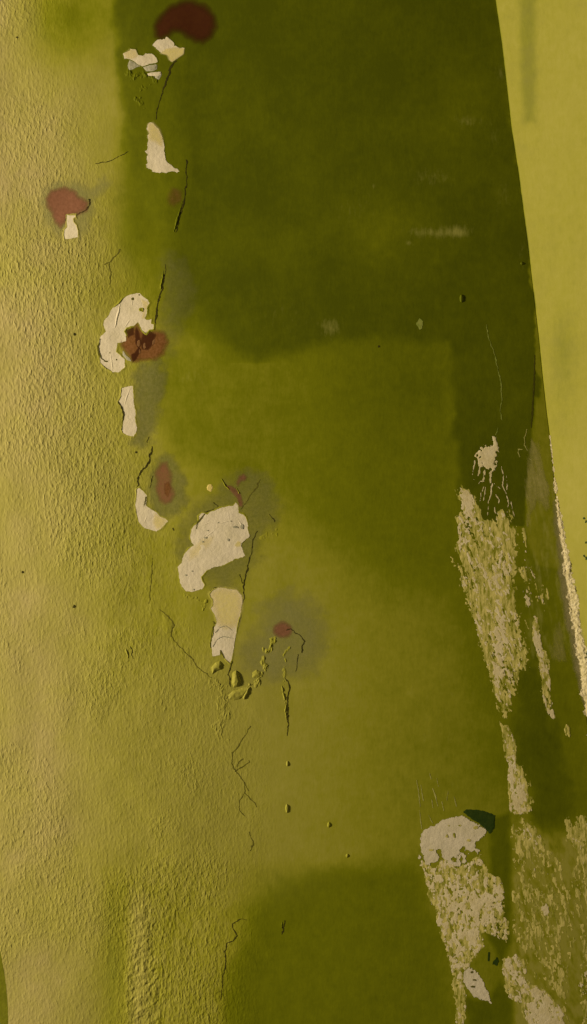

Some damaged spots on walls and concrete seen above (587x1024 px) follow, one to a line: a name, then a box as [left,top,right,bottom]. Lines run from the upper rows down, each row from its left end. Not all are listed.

rust [155,2,215,41]
peeling [121,35,186,109]
peeling [143,121,181,175]
rust [47,188,88,227]
crack [173,160,188,232]
peeling [95,290,156,438]
rust [121,325,167,361]
water stain [136,365,163,442]
peeling [176,484,252,666]
peeling [418,435,587,1024]
crack [231,726,257,851]
crack [220,919,245,1000]